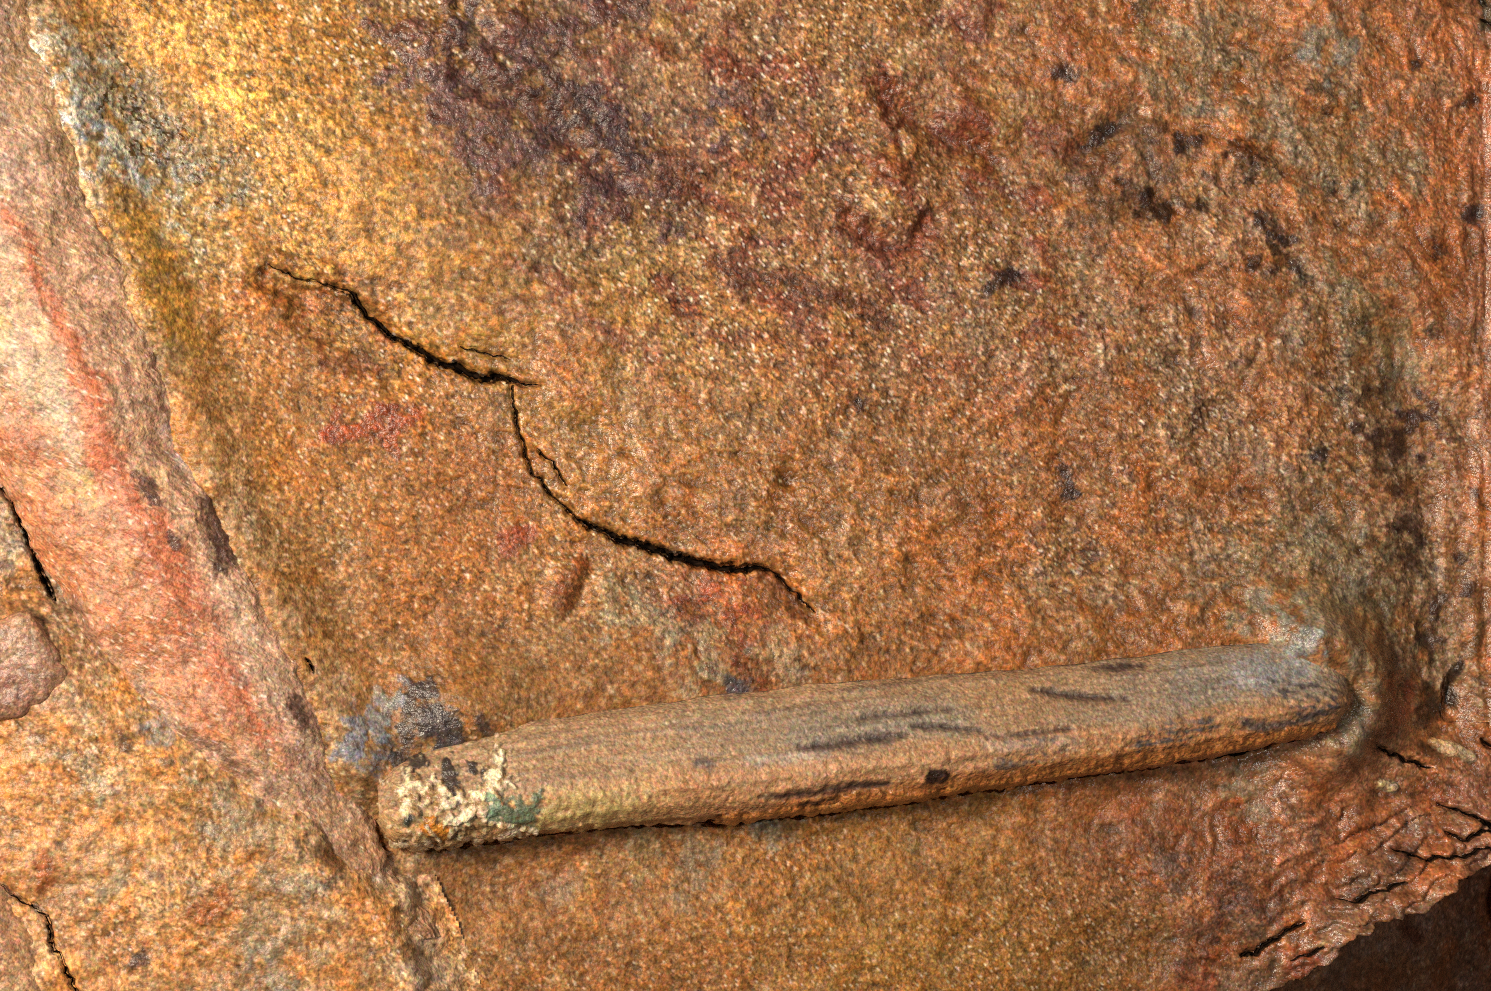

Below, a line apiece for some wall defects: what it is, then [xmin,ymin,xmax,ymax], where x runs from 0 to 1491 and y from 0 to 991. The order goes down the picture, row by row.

crack [268,264,814,612]
peeling [1377,779,1399,793]
peeling [1428,737,1477,763]
crack [1,884,77,991]